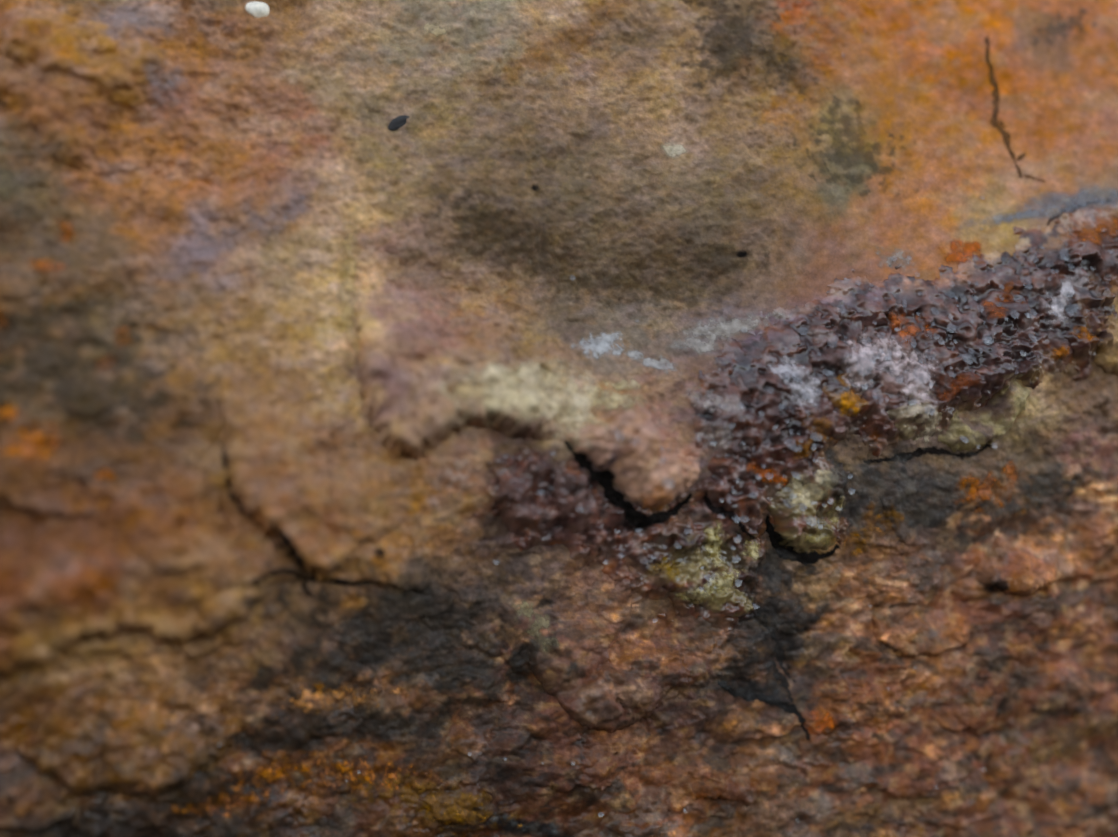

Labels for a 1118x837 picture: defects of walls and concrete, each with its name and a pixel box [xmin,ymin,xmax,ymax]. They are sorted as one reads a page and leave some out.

crack [985,37,1045,182]
crack [1048,199,1112,225]
corrosion [945,239,981,262]
corrosion [890,314,930,342]
corrosion [841,390,860,412]
corrosion [0,406,60,461]
corrosion [961,461,1017,511]
crack [221,444,381,597]
hole [626,517,648,531]
peeling [872,473,1118,659]
corrosion [281,683,409,713]
corrosion [172,750,493,829]